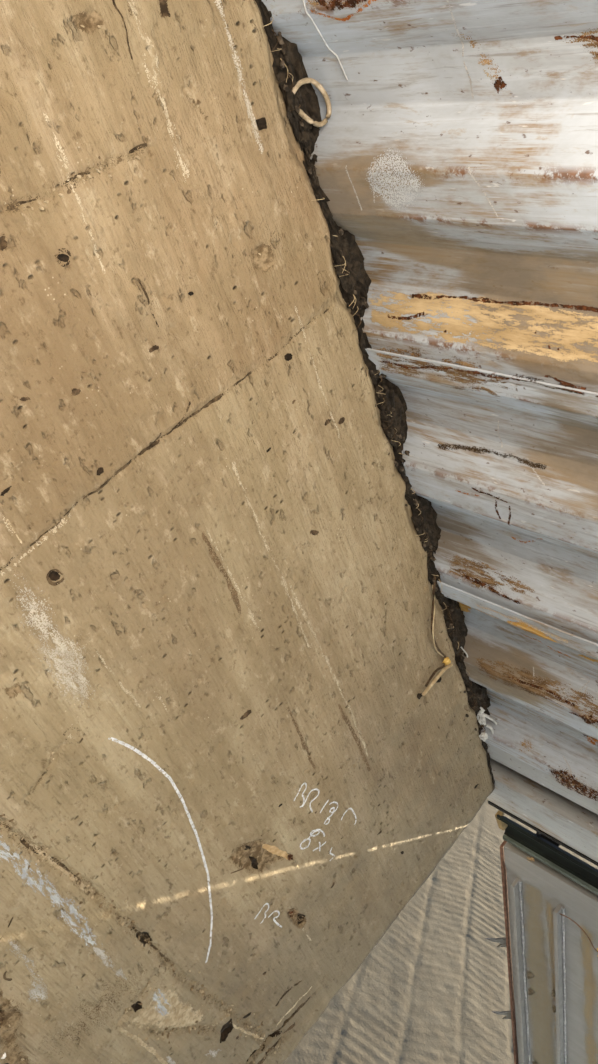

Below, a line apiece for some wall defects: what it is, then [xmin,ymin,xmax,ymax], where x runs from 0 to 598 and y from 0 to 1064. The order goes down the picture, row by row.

crack [112,0,133,60]
rust [554,28,598,63]
crack [3,143,147,227]
crack [138,278,159,327]
crack [0,304,330,576]
rust [457,601,598,662]
crack [477,722,495,789]
rust [546,767,598,801]
rust [569,712,598,745]
crack [0,814,313,1064]